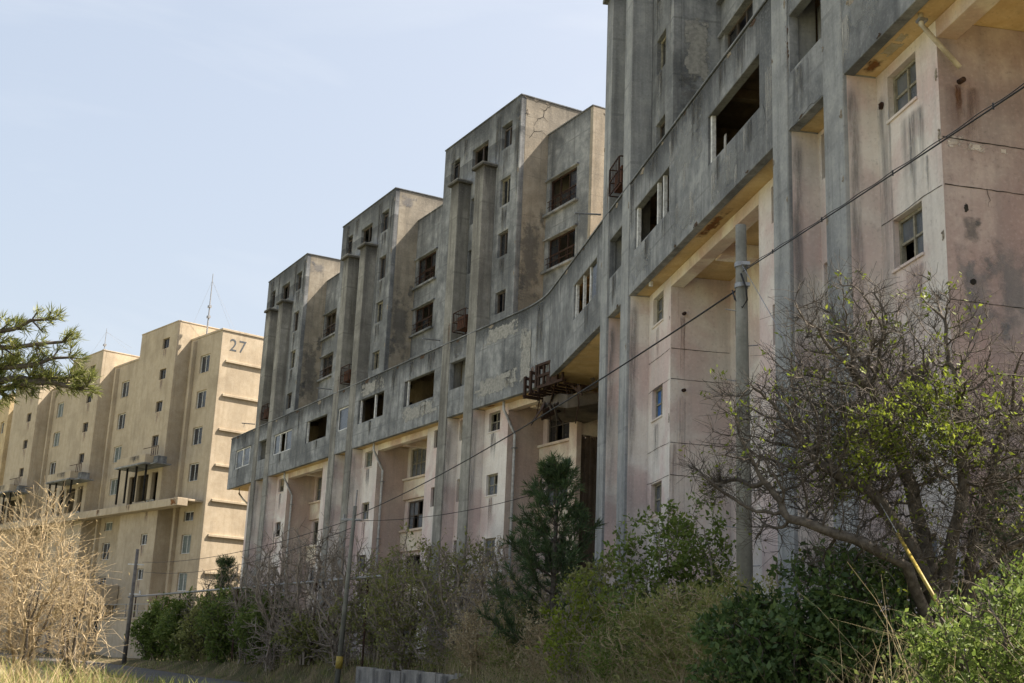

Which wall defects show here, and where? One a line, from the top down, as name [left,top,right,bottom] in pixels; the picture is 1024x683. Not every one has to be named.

peeling [684,18,710,82]
peeling [474,319,531,399]